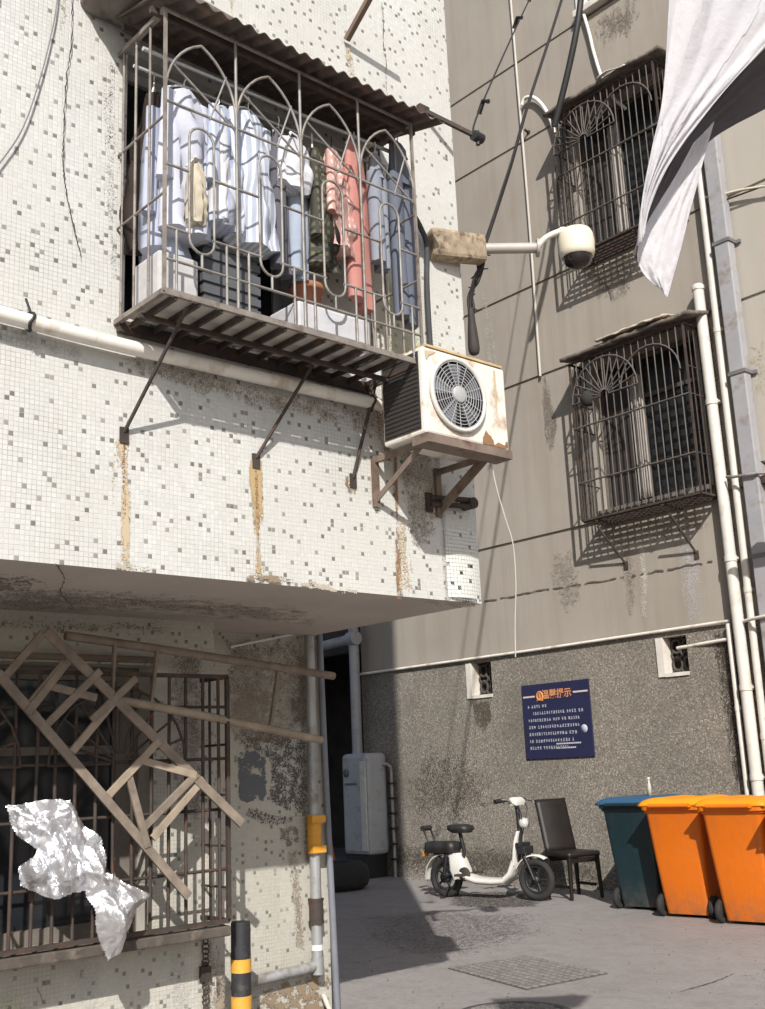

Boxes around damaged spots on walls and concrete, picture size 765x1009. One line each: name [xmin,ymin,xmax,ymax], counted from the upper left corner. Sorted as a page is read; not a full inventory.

crack [62,4,81,257]
rust [111,438,131,563]
rust [249,459,264,574]
damp [125,358,451,601]
rust [393,457,413,599]
damp [570,367,708,622]
peeling [241,728,307,826]